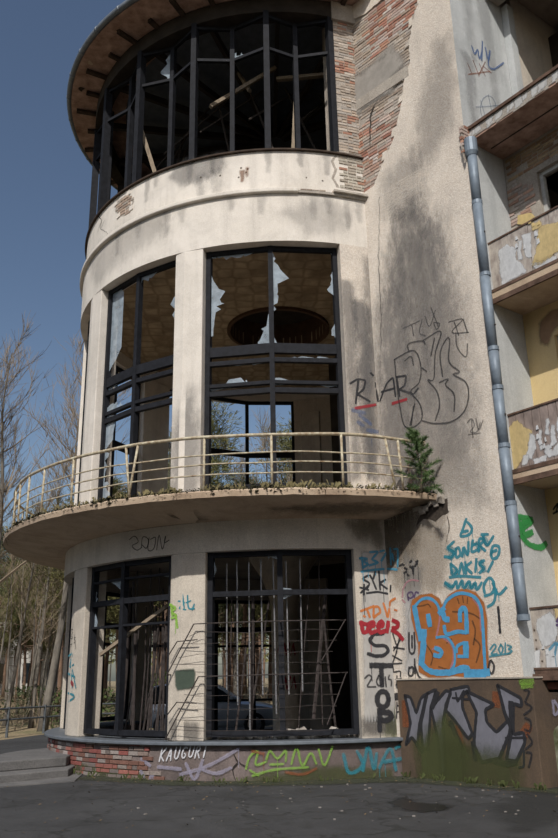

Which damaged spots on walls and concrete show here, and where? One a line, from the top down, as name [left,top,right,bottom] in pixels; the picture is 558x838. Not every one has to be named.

spalling [301,0,420,192]
spalling [114,190,134,219]
peeling [498,128,558,285]
peeling [509,418,558,469]
spalling [412,496,449,527]
peeling [533,609,558,668]